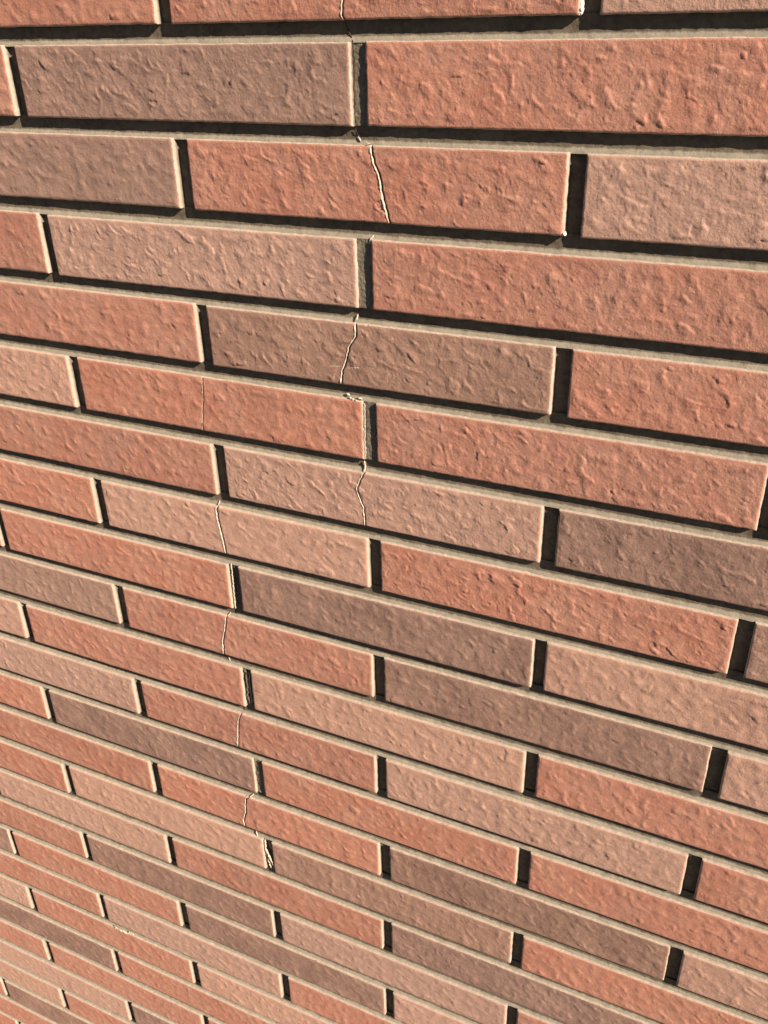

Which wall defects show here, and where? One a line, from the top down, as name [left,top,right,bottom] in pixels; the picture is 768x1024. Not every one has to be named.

crack [340,0,391,383]
crack [356,401,378,525]
crack [215,500,265,837]